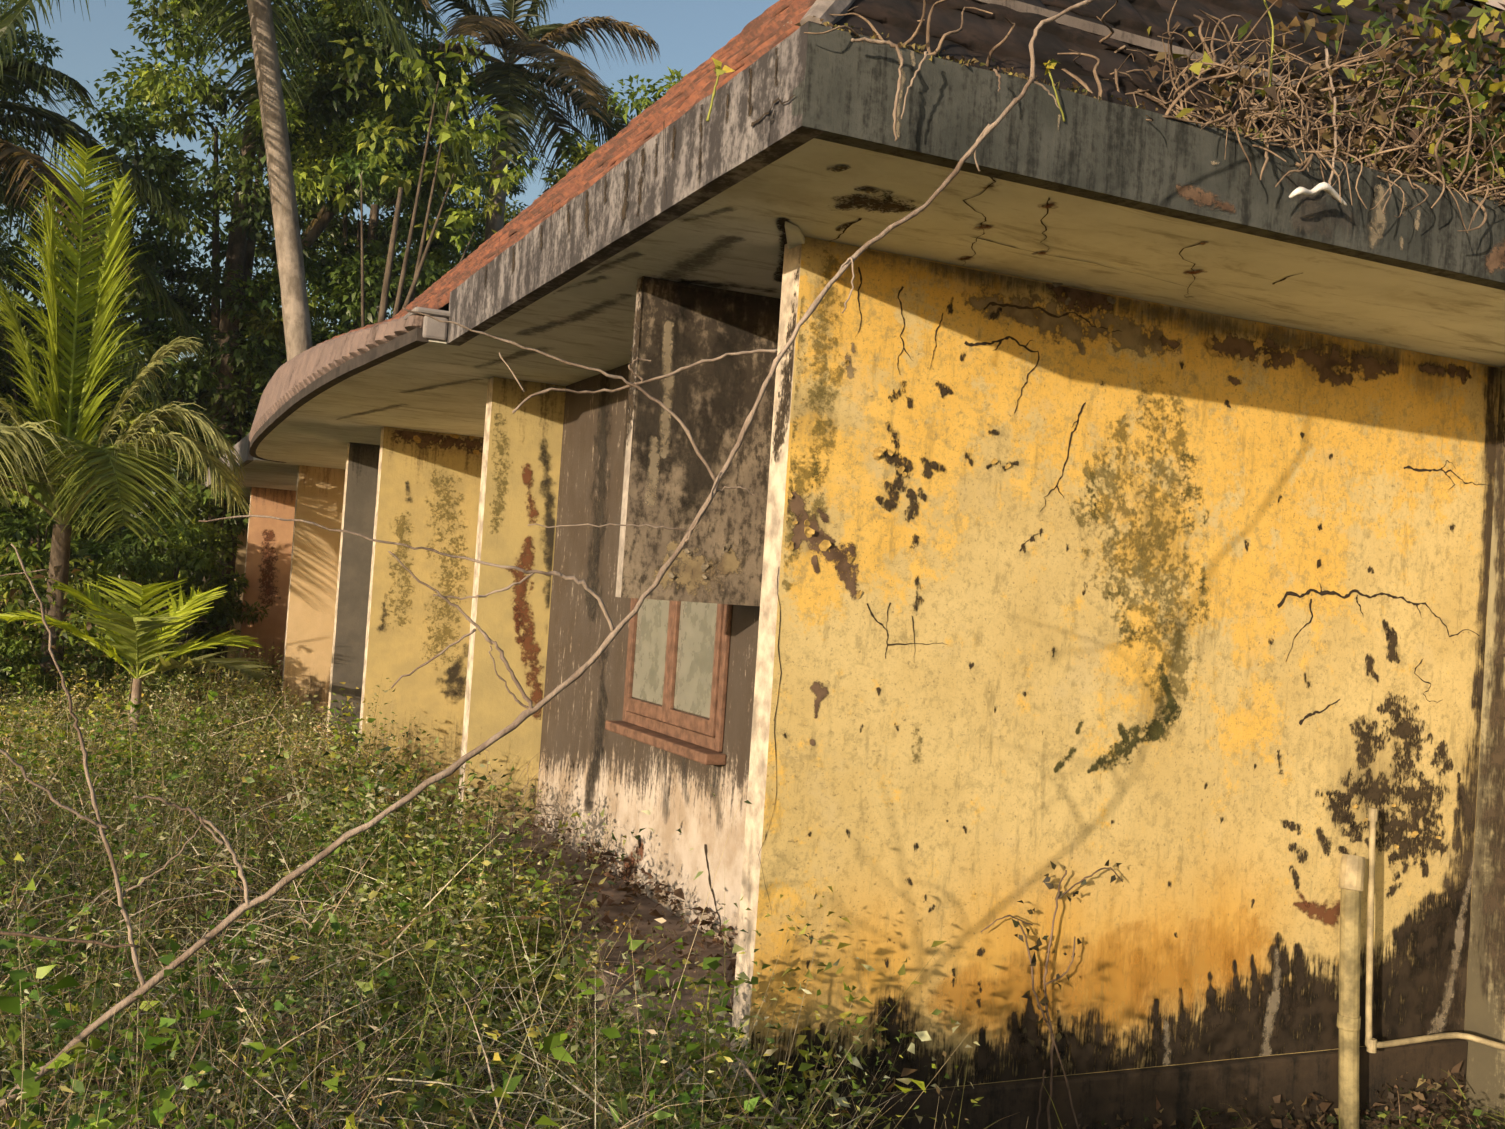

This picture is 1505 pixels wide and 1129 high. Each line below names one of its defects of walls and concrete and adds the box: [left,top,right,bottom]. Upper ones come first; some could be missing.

rust [508,463,544,720]
water stain [476,218,803,621]
spalling [787,490,862,599]
peeling [888,380,913,409]
peeling [872,422,945,548]
crack [897,286,1040,414]
crack [1020,402,1086,551]
water stain [1087,663,1181,773]
crack [1299,699,1340,725]
crack [1277,583,1505,703]
water stain [1281,366,1505,1047]
water stain [747,932,1339,1105]